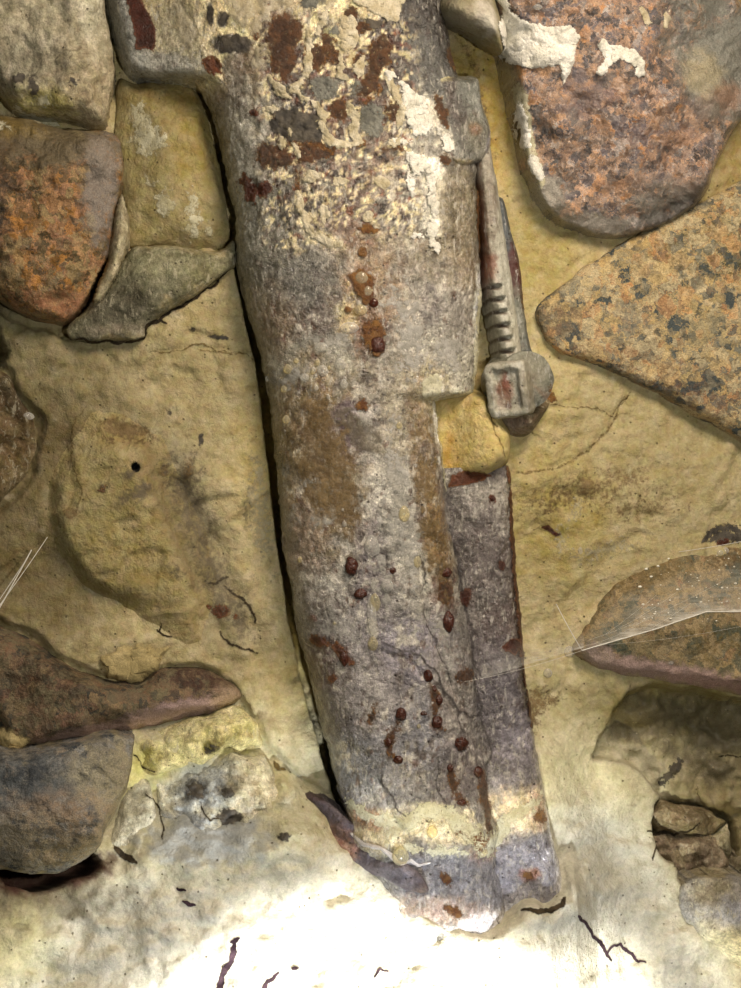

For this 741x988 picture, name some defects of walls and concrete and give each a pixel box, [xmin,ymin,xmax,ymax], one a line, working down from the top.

peeling [206,0,406,149]
peeling [278,127,301,159]
peeling [294,169,349,248]
rust [344,247,376,313]
rust [361,317,387,357]
crack [518,397,628,474]
rust [448,471,492,487]
rust [499,463,533,728]
rust [420,670,447,732]
rust [384,707,407,764]
rust [455,737,469,752]
rust [447,763,494,853]